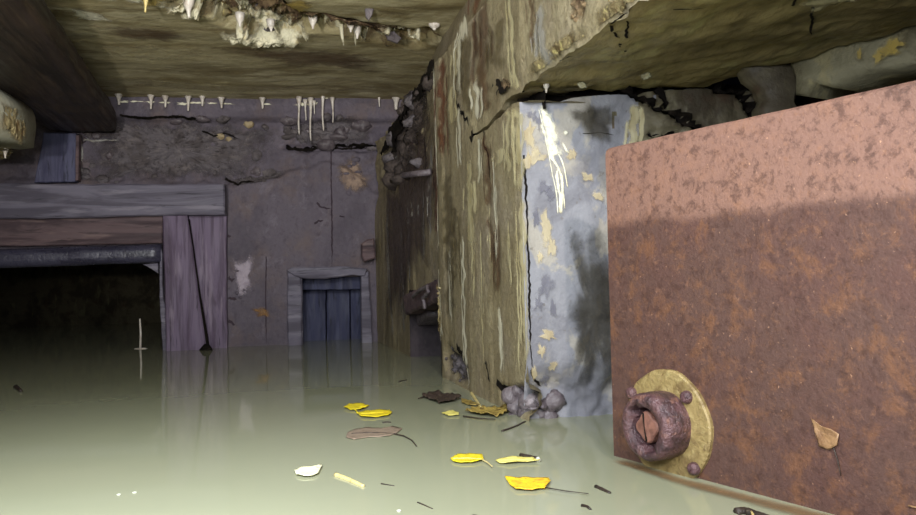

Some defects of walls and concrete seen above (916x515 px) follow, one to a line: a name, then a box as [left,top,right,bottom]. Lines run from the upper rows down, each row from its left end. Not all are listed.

damp [130,0,203,20]
damp [224,0,310,49]
damp [324,14,420,46]
crack [601,13,629,52]
crack [120,114,238,139]
crack [286,59,434,257]
crack [456,101,490,177]
crack [518,81,756,138]
damp [386,73,439,326]
damp [438,16,576,386]
flaking render [234,257,252,299]
corrosion [622,462,824,515]